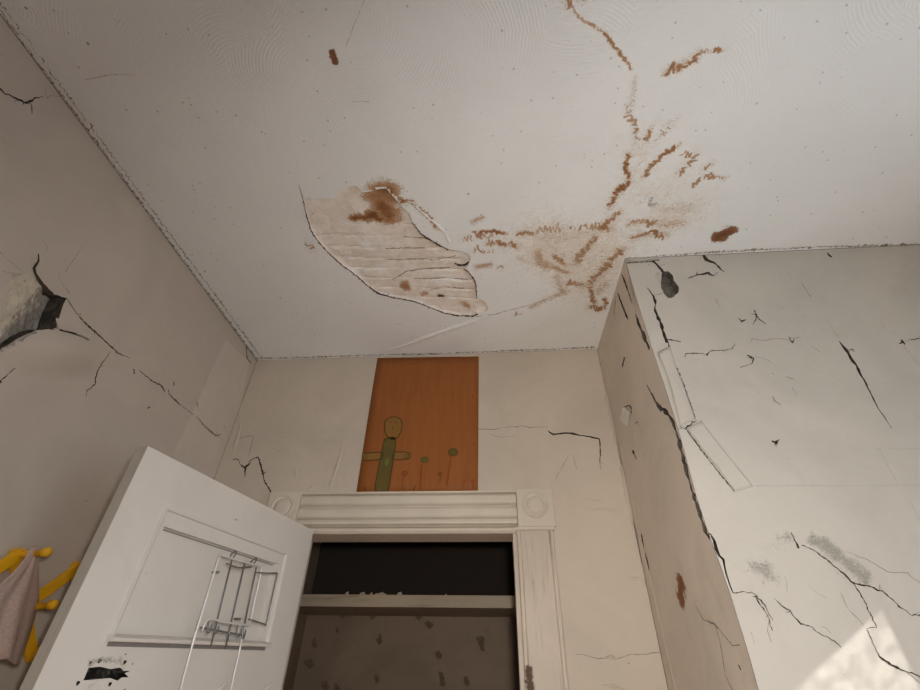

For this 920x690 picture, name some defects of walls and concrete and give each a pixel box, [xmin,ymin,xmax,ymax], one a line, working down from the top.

crack [0,3,595,364]
spalling [299,186,544,317]
spalling [652,261,679,298]
rust [710,226,738,243]
crack [627,243,920,278]
spalling [0,253,130,380]
crack [133,369,223,440]
crack [233,456,272,493]
peeling [686,421,754,492]
crack [635,288,920,689]
rust [676,573,686,609]